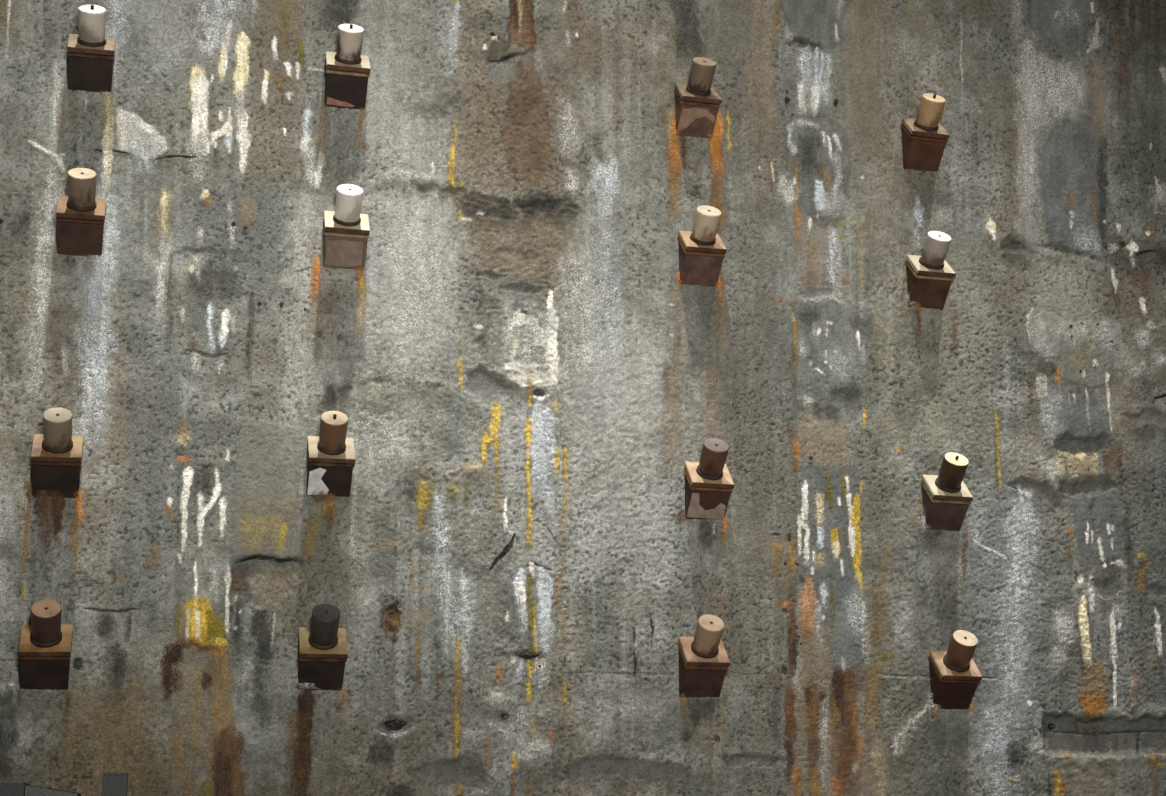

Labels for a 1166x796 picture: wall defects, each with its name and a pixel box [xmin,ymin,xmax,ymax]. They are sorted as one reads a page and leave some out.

spalling [483,0,536,64]
damp [796,0,880,158]
spalling [408,169,579,225]
rust [668,111,725,227]
damp [759,132,864,290]
damp [154,191,255,374]
spalling [1057,435,1108,456]
spalling [381,594,404,642]
crack [489,533,552,570]
damp [771,413,893,721]
rust [770,574,871,796]
rust [1080,661,1107,720]